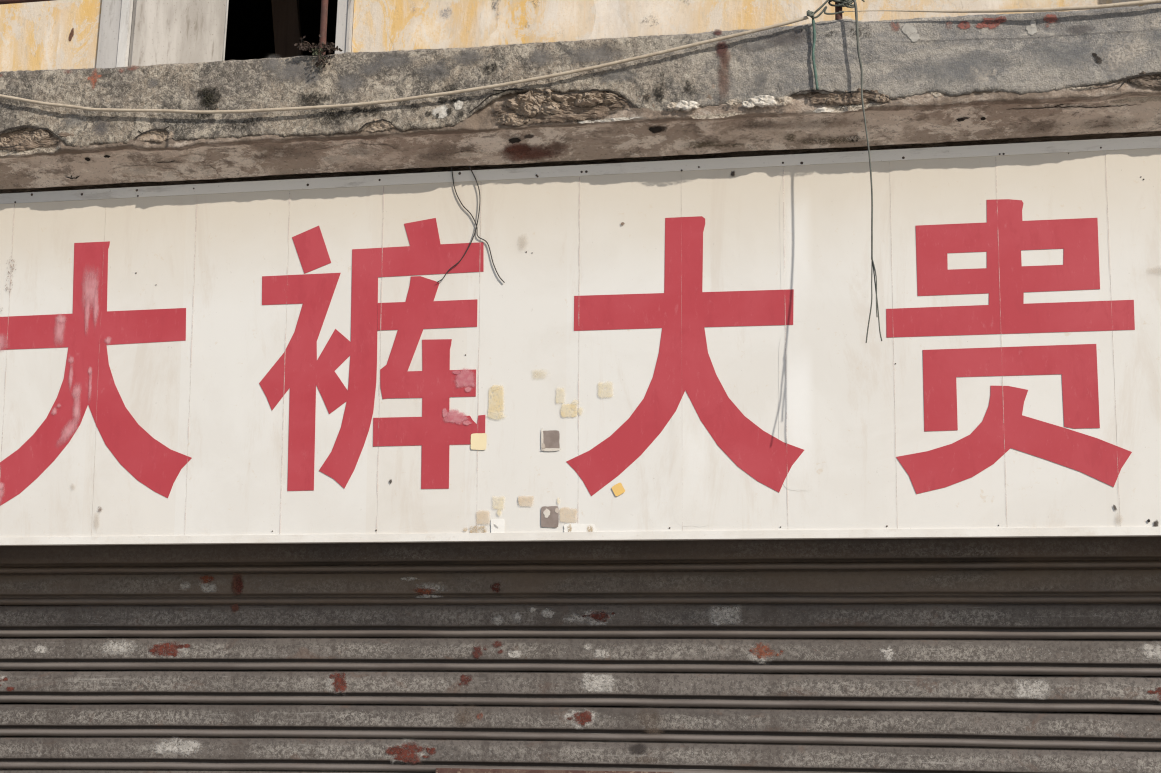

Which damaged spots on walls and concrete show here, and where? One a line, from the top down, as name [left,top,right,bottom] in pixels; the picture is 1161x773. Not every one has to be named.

corrosion [714,29,727,57]
spalling [487,89,666,138]
spalling [0,128,74,156]
corrosion [149,642,190,657]
corrosion [749,642,783,661]
corrosion [565,710,595,728]
corrosion [386,742,435,763]